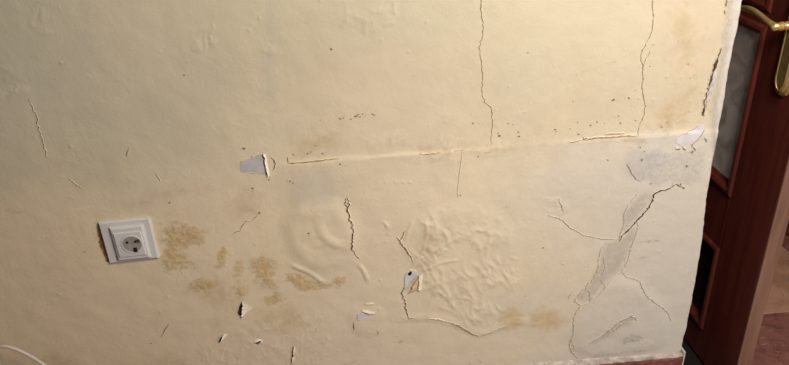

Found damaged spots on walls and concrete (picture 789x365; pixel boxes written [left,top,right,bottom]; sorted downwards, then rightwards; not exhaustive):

crack [478,0,494,143]
crack [582,0,655,140]
crack [29,100,48,158]
peeling [675,49,722,153]
peeling [240,154,277,176]
crack [287,157,339,165]
crack [344,198,360,259]
peeling [238,301,253,317]
crack [400,287,416,319]
peeling [404,269,423,292]
crack [448,322,479,336]
crack [549,183,683,360]